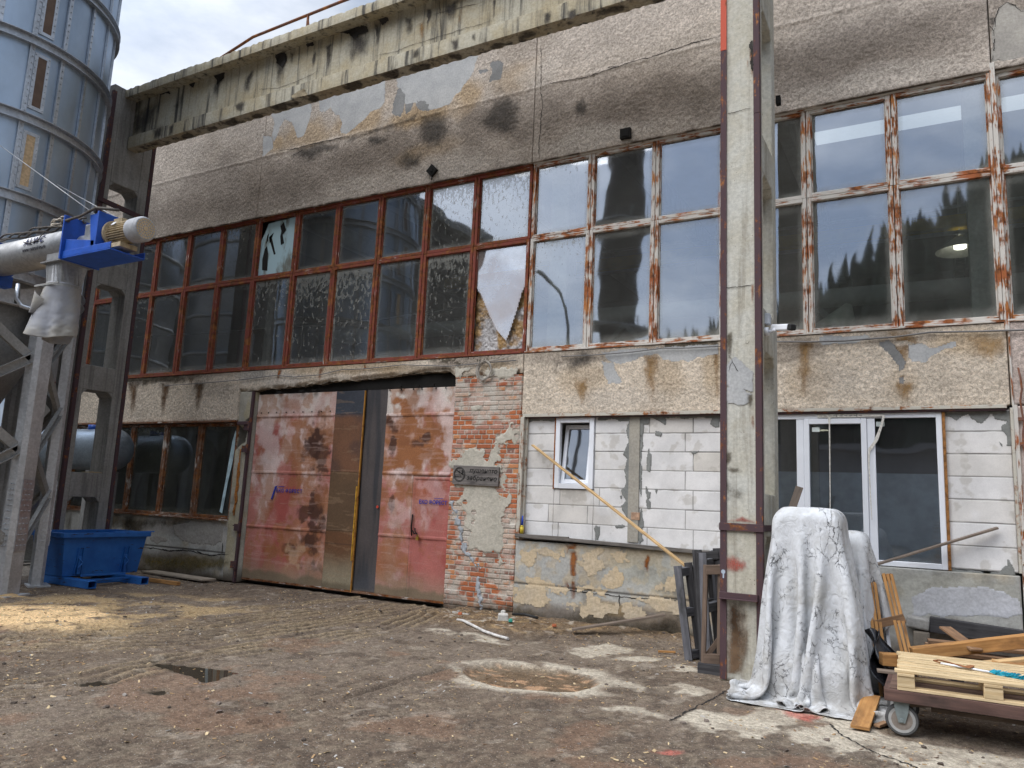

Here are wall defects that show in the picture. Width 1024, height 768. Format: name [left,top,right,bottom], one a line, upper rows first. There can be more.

leakage [598,6,624,15]
leakage [133,101,196,145]
leakage [208,95,319,130]
leakage [344,81,362,90]
flaking render [262,56,503,157]
leakage [383,50,430,79]
flaking render [455,366,518,380]
flaking render [601,343,718,384]
flaking render [819,334,956,384]
flaking render [448,422,520,565]
corrosion [567,544,577,593]
flaking render [511,546,679,619]